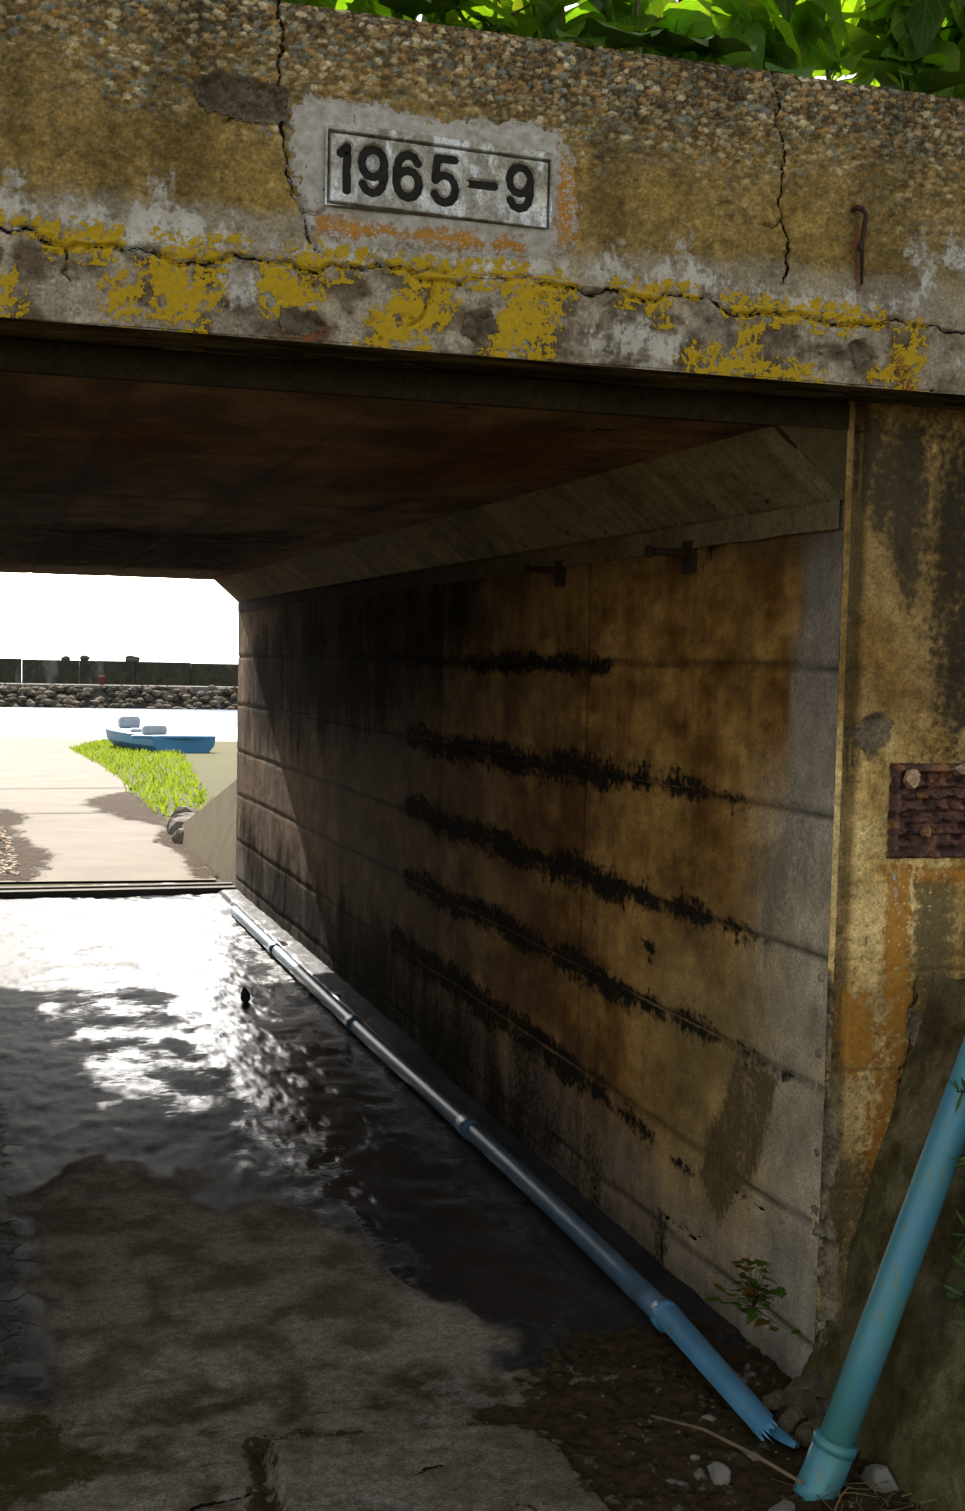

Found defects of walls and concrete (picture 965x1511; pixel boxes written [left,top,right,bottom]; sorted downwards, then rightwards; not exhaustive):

crack [0,0,965,335]
corrosion [851,205,869,299]
water stain [854,410,965,764]
water stain [82,792,217,878]
corrosion [903,769,921,789]
water stain [240,792,805,1220]
spalling [811,970,842,1349]
crack [412,1465,444,1475]